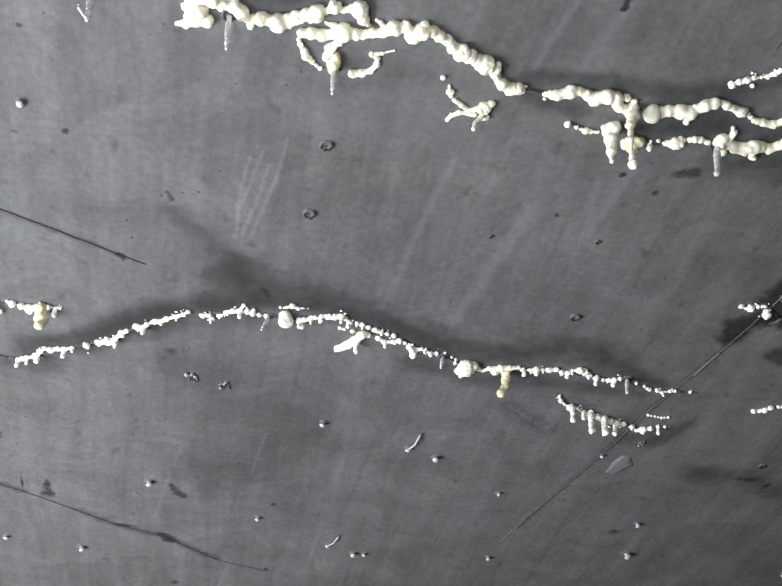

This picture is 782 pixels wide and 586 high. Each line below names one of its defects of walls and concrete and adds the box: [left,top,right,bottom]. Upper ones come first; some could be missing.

crack [526,86,544,94]
crack [622,127,665,144]
crack [169,310,237,318]
damp [722,284,782,343]
crack [738,305,782,325]
crack [0,322,150,359]
crack [256,305,460,364]
crack [560,369,696,394]